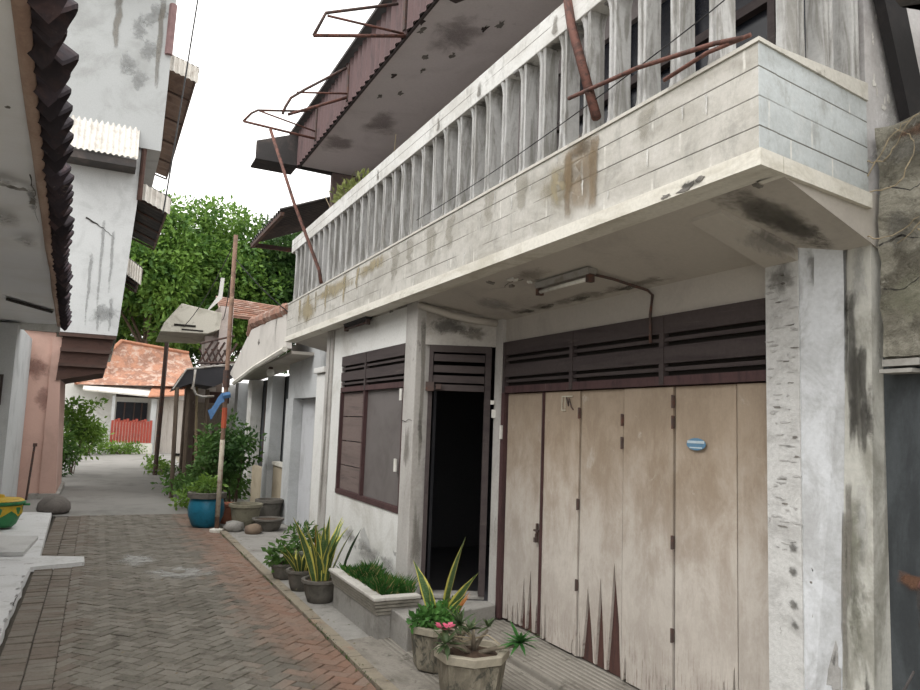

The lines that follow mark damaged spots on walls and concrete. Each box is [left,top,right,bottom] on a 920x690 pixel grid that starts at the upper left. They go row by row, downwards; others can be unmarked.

leakage [113,0,122,44]
leakage [134,3,166,77]
leakage [121,55,145,87]
crack [28,174,39,222]
spalling [661,175,705,199]
leakage [740,198,813,238]
leakage [843,250,873,448]
leakage [841,488,865,658]
peeling [826,641,841,690]